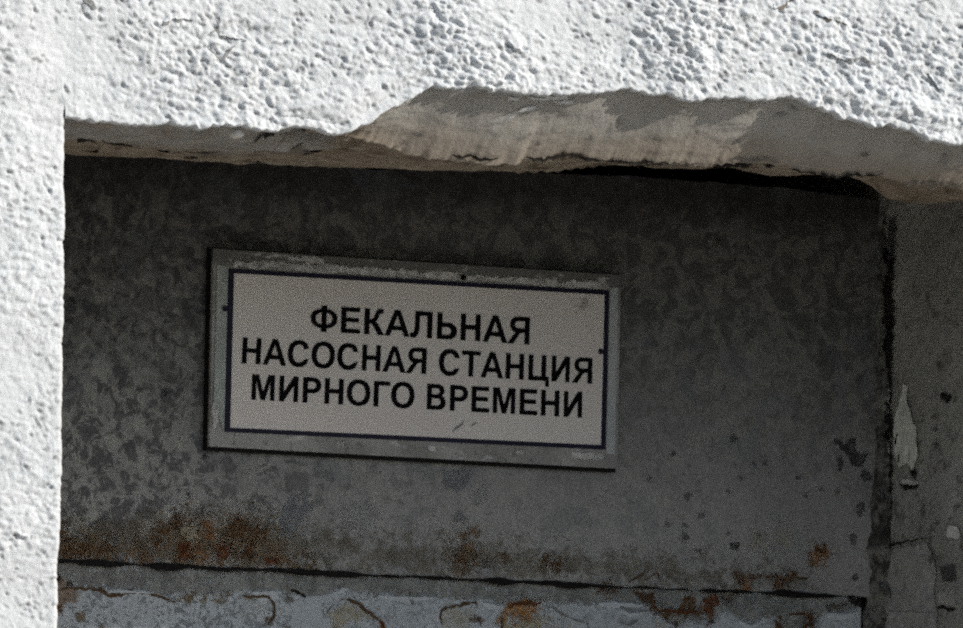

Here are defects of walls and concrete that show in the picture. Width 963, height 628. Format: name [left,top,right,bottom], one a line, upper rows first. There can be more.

spalling [342,87,963,189]
corrosion [56,503,318,628]
corrosion [443,525,512,584]
corrosion [496,598,542,628]
corrosion [632,543,836,628]